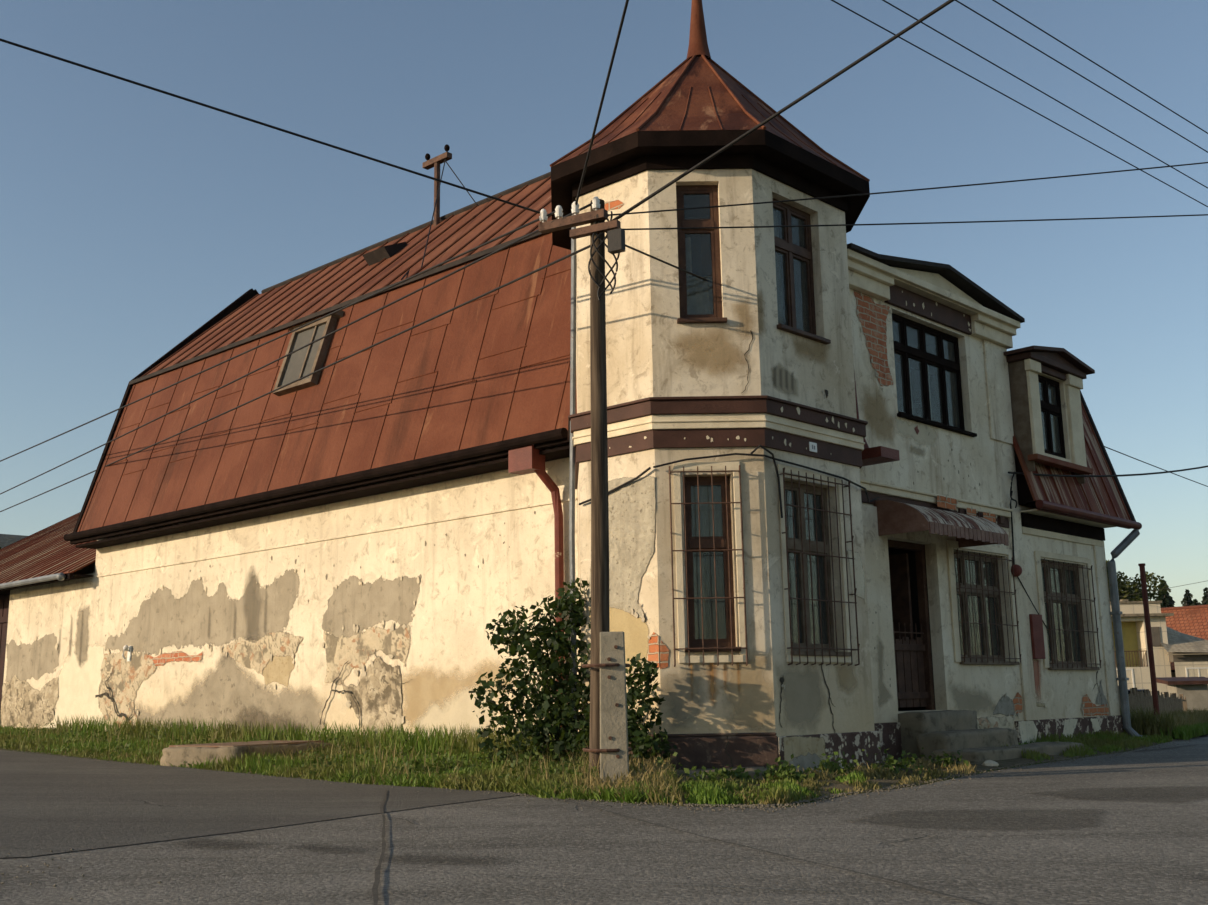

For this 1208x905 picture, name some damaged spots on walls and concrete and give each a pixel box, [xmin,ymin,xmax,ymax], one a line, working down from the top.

flaking render [853,289,893,390]
flaking render [608,476,669,669]
flaking render [1,633,59,729]
peeling [98,556,309,729]
peeling [322,565,495,739]
rust [710,662,739,698]
flaking render [790,736,876,774]